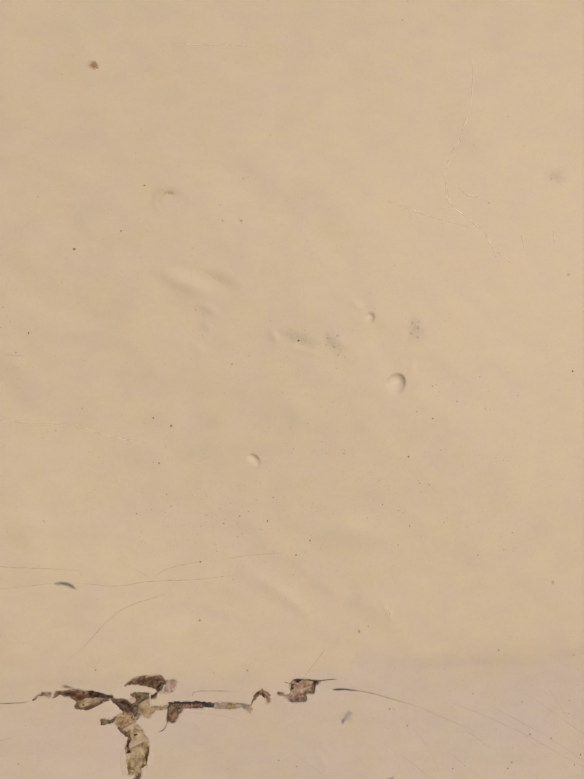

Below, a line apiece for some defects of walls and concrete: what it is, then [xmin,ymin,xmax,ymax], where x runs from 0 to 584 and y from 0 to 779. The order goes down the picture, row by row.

peeling [32,675,319,779]